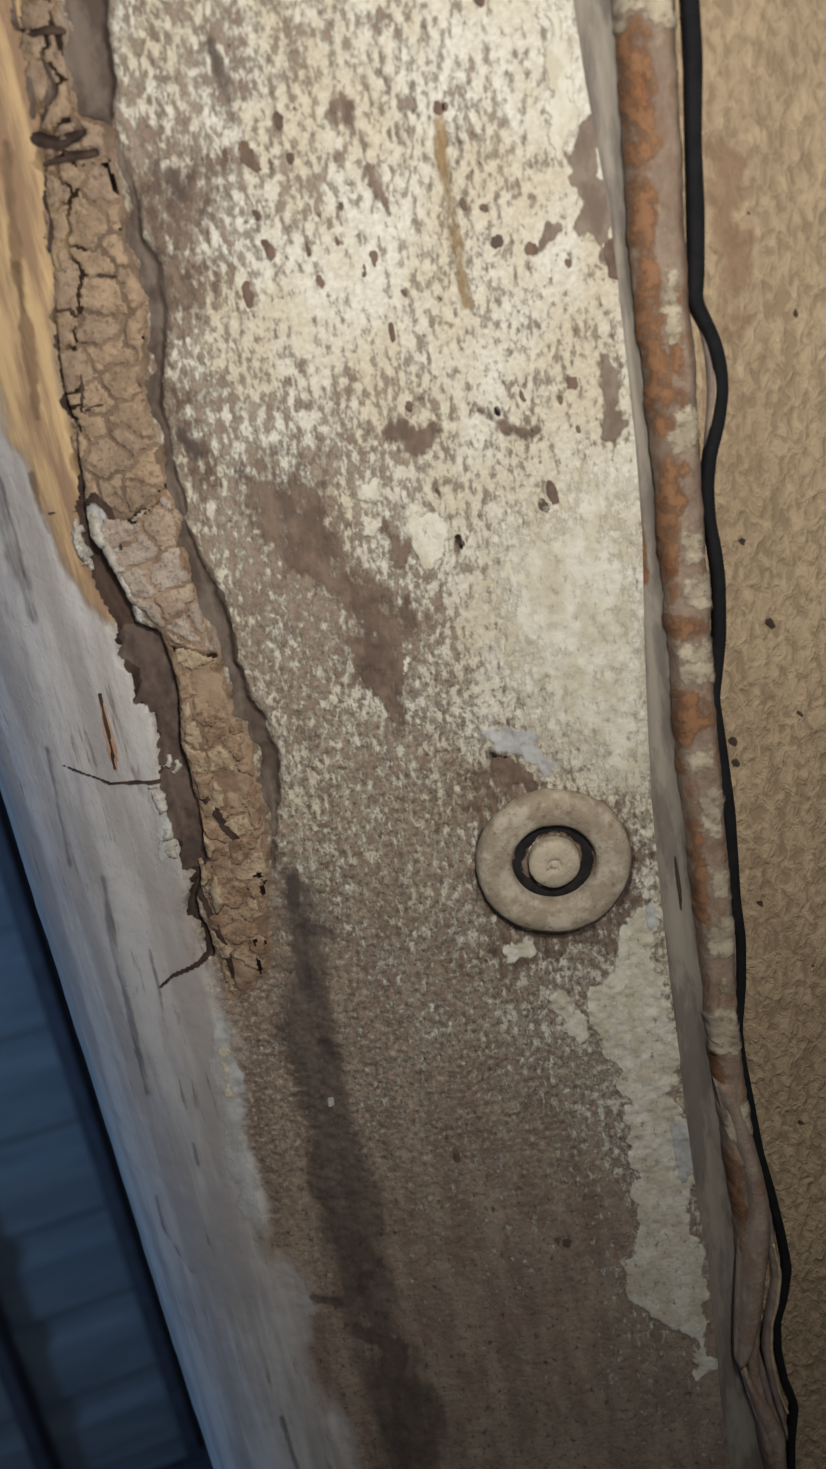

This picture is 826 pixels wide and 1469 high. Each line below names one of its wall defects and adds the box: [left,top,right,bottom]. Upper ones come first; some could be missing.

peeling [222,140,295,172]
peeling [261,239,289,261]
rust [616,15,687,438]
peeling [19,0,271,1001]
crack [11,0,281,867]
damp [246,443,430,734]
damp [382,418,444,456]
damp [478,407,542,439]
rust [641,456,708,640]
rust [670,689,716,773]
crack [159,841,235,987]
damp [287,873,439,1469]